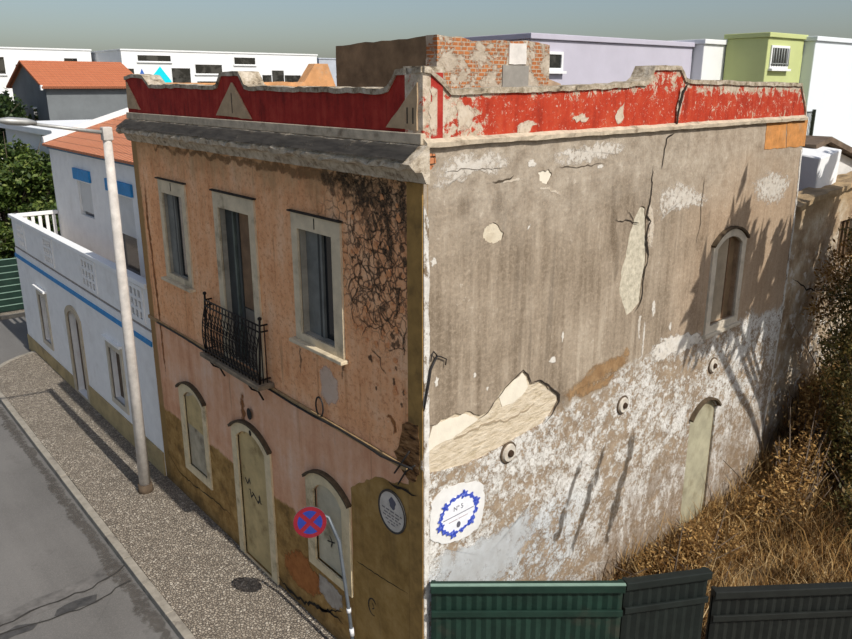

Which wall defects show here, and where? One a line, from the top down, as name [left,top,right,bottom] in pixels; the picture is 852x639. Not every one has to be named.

peeling [428,87,474,136]
peeling [517,120,536,133]
crack [617,84,688,310]
spalling [483,223,503,244]
spalling [619,207,646,315]
damp [567,348,629,400]
spalling [389,370,560,496]
damp [554,468,580,539]
damp [573,453,603,549]
damp [606,436,635,542]
crack [279,577,341,622]